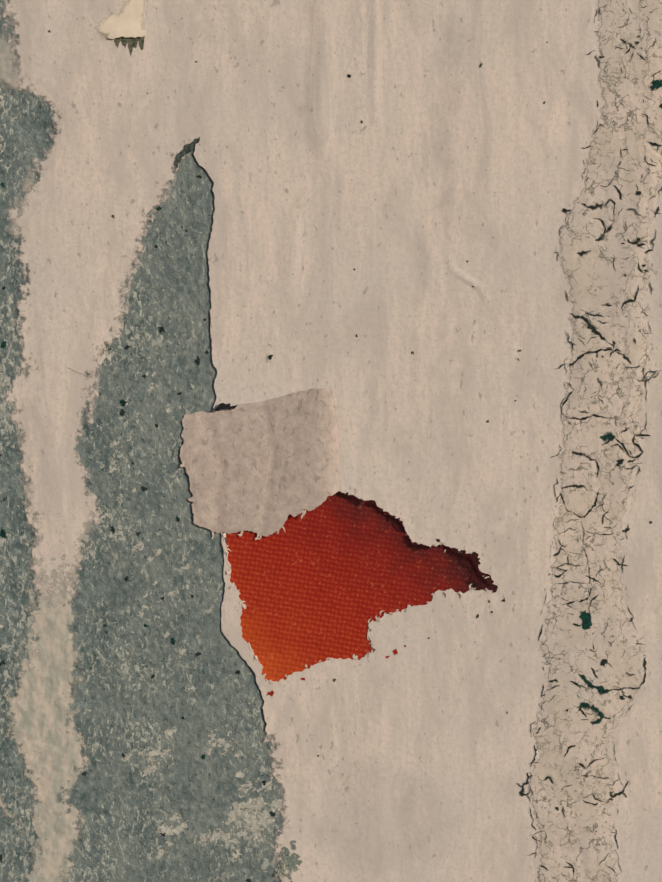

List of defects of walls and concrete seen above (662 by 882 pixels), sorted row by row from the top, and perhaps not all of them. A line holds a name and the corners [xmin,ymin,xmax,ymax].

peeling [73,143,287,882]
crack [516,6,662,881]